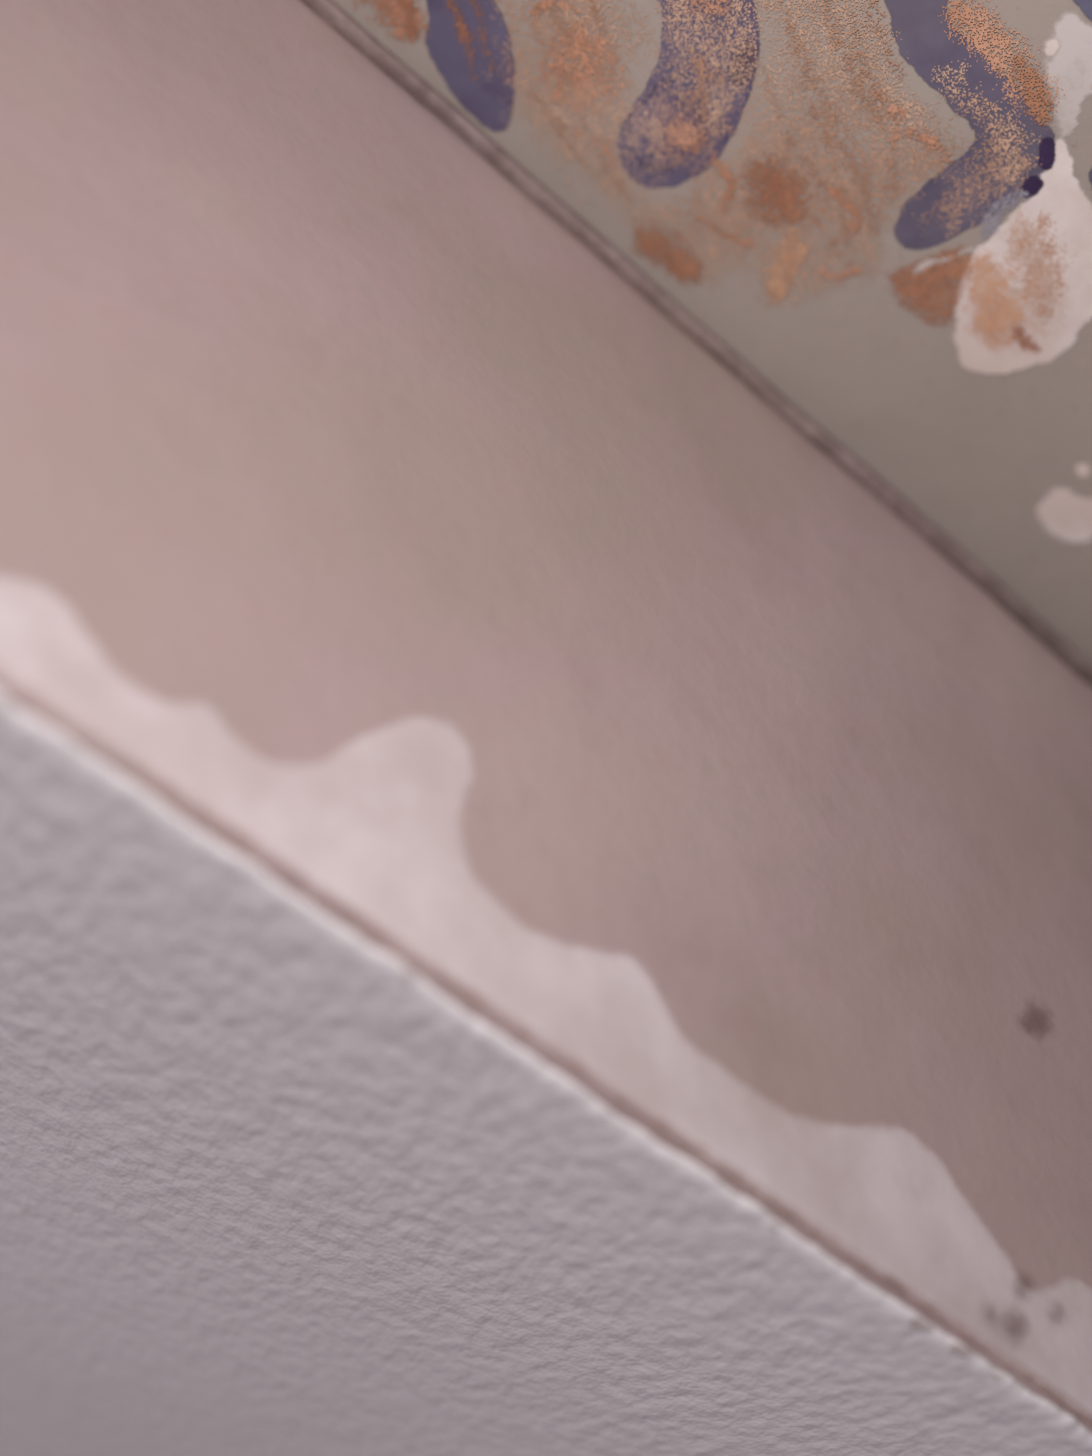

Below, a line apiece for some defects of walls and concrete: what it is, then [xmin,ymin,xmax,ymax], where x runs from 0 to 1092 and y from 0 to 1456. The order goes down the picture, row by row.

rust [885,0,1065,328]
peeling [953,13,1092,374]
peeling [1035,463,1092,543]